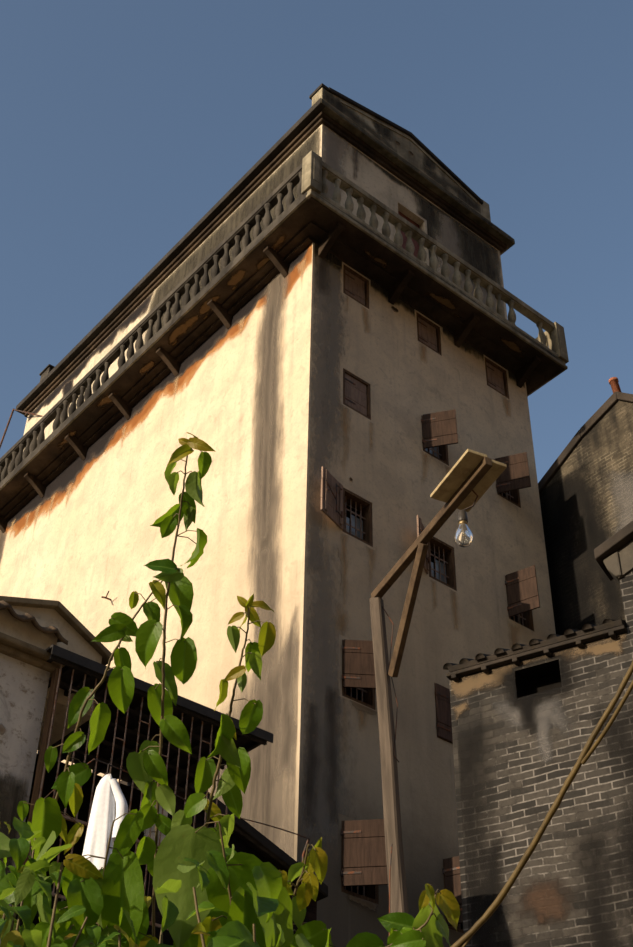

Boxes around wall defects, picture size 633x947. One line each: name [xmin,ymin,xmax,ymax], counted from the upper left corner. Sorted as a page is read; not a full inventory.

corrosion [283,243,312,298]
corrosion [4,283,270,537]
leakage [231,272,344,857]
leakage [0,776,26,839]
leakage [208,765,227,805]